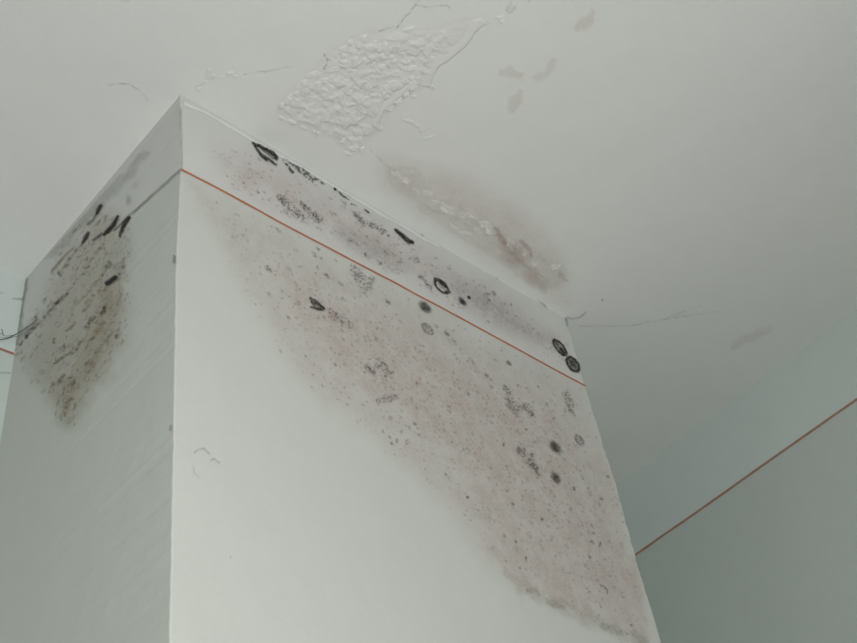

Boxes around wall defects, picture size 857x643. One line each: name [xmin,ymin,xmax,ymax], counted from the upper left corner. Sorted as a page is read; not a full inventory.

leakage [252,142,323,183]
leakage [82,215,131,243]
leakage [552,339,581,372]